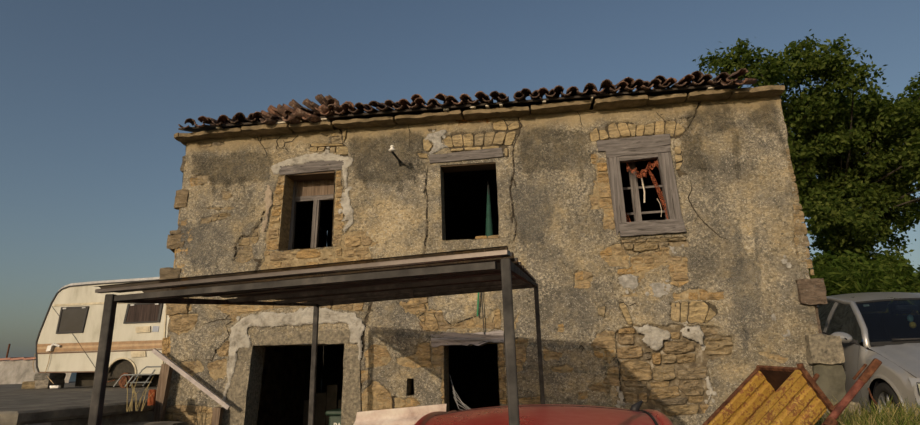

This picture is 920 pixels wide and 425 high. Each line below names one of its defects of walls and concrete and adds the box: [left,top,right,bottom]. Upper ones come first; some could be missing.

crack [233,211,265,270]
crack [257,135,298,157]
flaking render [236,130,377,270]
crack [421,170,429,253]
crack [509,118,522,242]
flaking render [589,153,615,230]
flaking render [589,105,688,177]
flaking render [162,300,445,425]
flaking render [399,297,501,332]
flaking render [497,343,507,404]
flaking render [577,237,733,416]